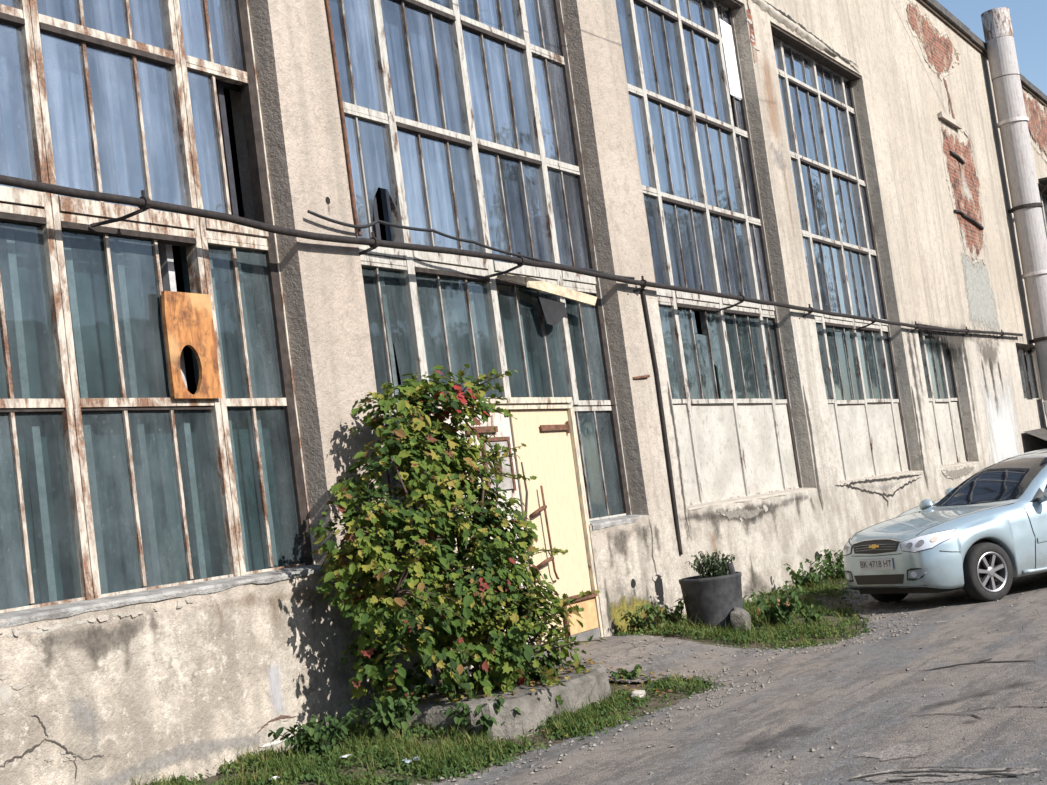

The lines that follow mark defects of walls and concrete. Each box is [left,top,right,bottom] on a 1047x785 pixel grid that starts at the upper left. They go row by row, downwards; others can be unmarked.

spalling [746,9,760,62]
spalling [904,0,961,82]
spalling [1022,90,1047,163]
spalling [938,111,987,266]
crack [835,474,921,536]
leakage [44,618,157,661]
crack [0,715,104,783]